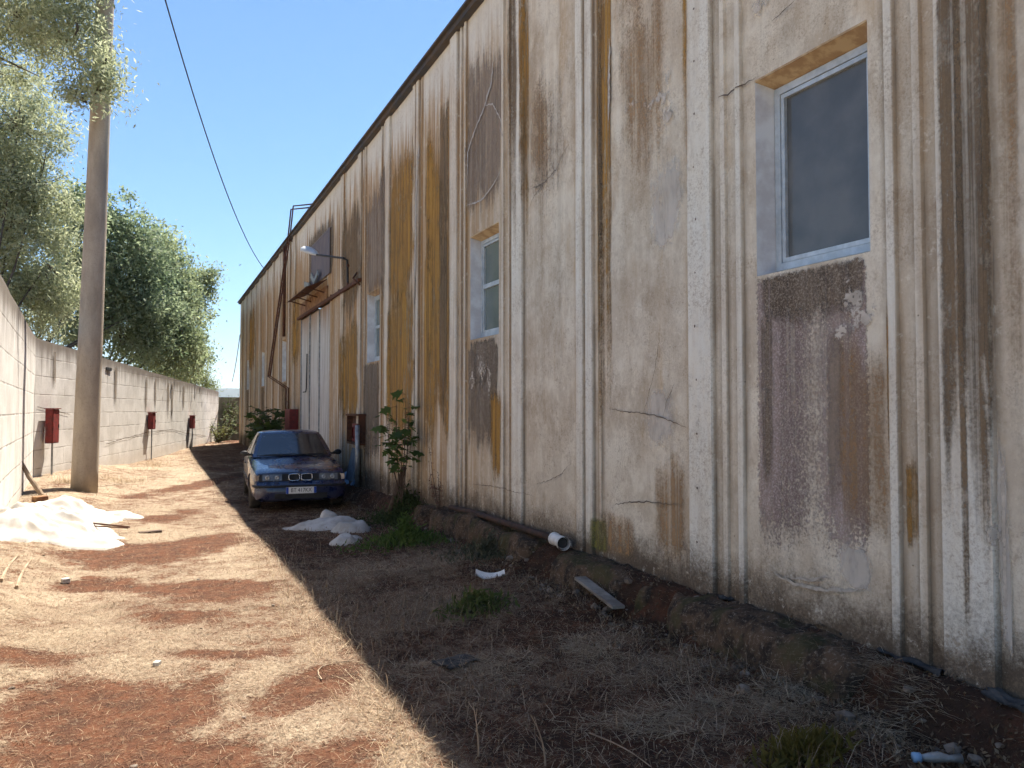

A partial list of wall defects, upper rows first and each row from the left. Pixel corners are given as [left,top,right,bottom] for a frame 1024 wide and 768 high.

corrosion [386,102,449,446]
leakage [468,338,498,447]
corrosion [491,393,501,474]
crack [609,338,685,427]
leakage [756,258,870,559]
crack [615,498,681,506]